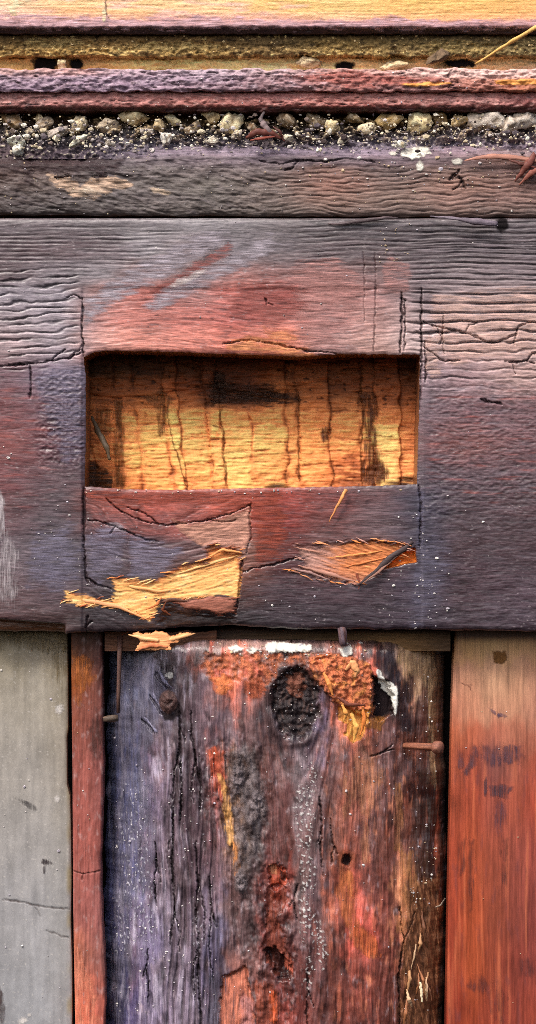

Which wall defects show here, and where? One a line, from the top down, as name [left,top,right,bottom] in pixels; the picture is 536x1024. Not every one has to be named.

crack [374,287,536,401]
peeling [176,506,250,549]
peeling [173,596,236,616]
crack [154,718,215,1017]